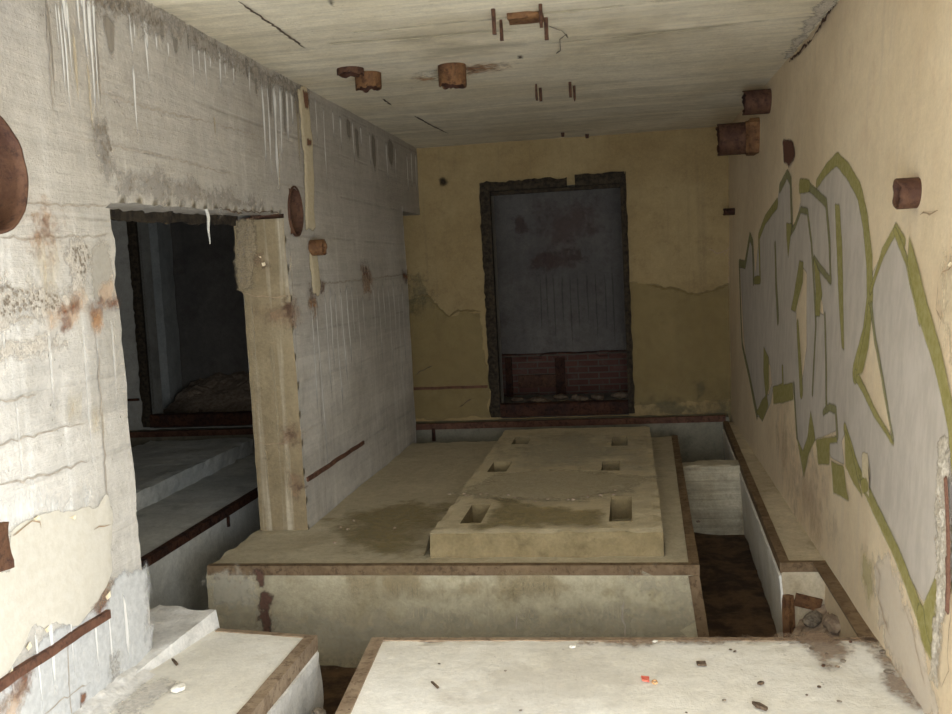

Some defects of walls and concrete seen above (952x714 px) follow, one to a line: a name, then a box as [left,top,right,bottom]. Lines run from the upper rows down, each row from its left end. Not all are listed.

water stain [47,0,114,103]
crack [238,1,304,48]
water stain [129,13,417,190]
rust [51,282,118,331]
peeling [0,494,153,714]
rust [255,569,274,632]
peeling [875,436,952,714]
spalling [117,678,186,714]